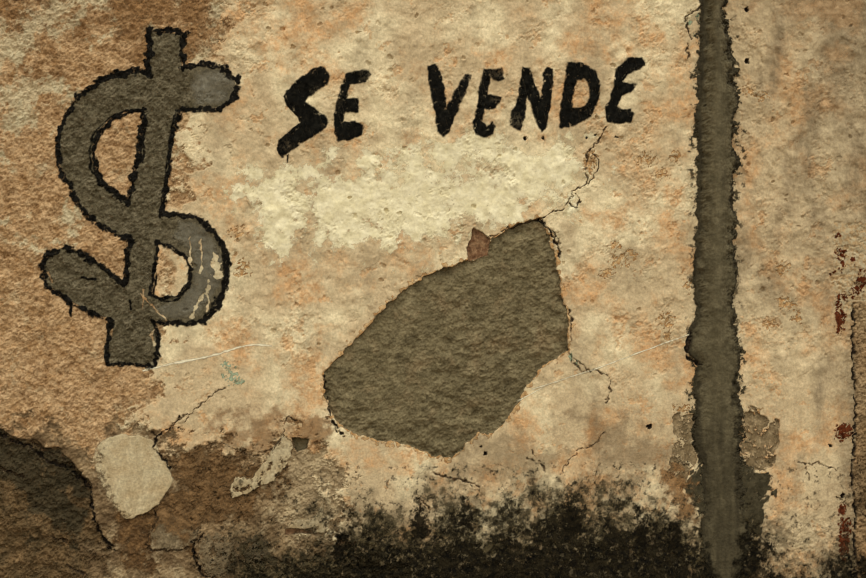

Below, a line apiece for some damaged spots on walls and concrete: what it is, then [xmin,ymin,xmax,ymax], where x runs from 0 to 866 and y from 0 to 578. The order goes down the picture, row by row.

crack [488,127,606,258]
spalling [320,215,575,464]
peeling [229,435,308,498]
peeling [740,406,779,471]
peeling [150,524,198,551]
damp [112,443,295,575]
peeling [285,503,325,535]
damp [228,465,719,578]
damp [733,516,866,578]